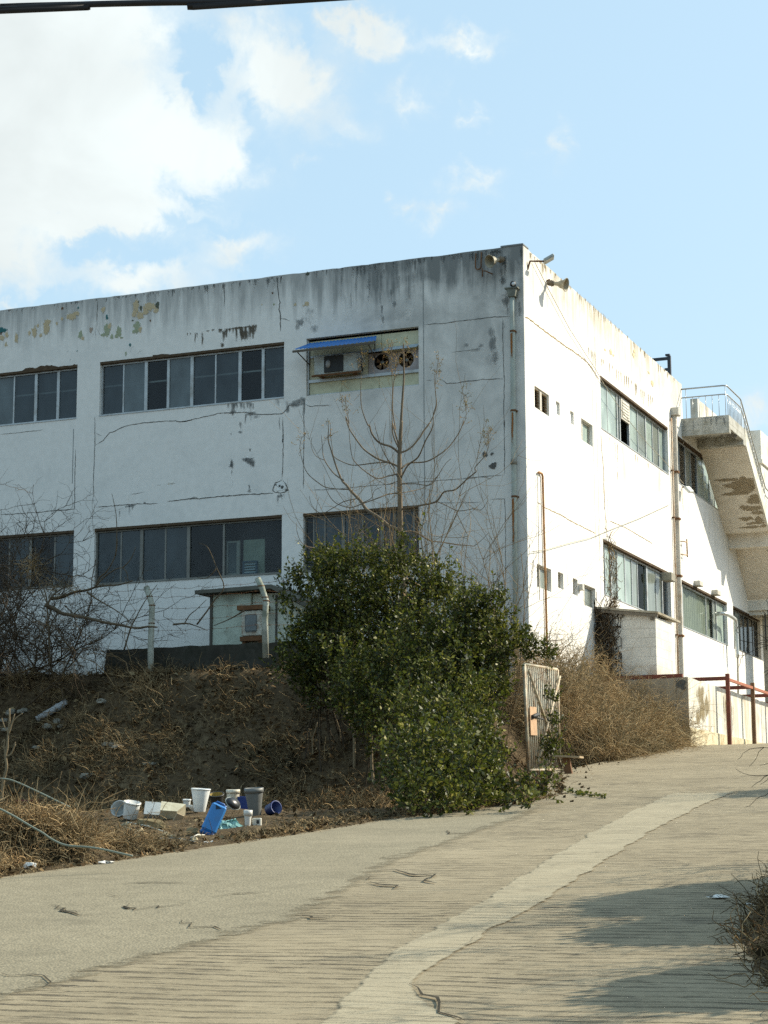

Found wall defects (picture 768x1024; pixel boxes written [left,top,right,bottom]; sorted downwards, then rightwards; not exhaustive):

peeling [0,307,79,347]
peeling [78,299,159,356]
crack [1,315,599,569]